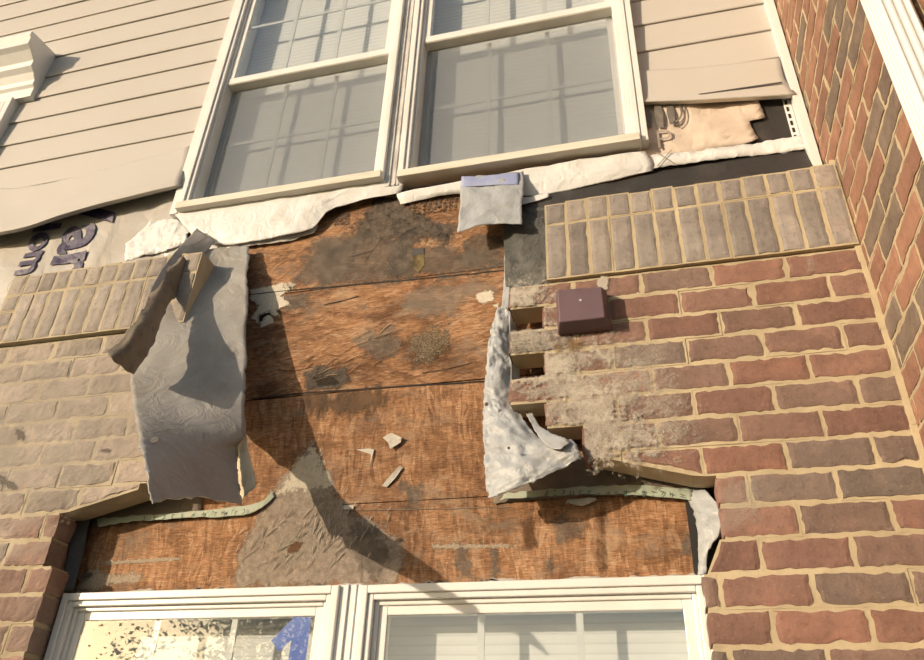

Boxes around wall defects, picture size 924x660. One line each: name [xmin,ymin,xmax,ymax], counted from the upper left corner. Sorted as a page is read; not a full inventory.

leakage [283,196,504,311]
peeling [303,321,406,390]
peeling [236,487,375,574]